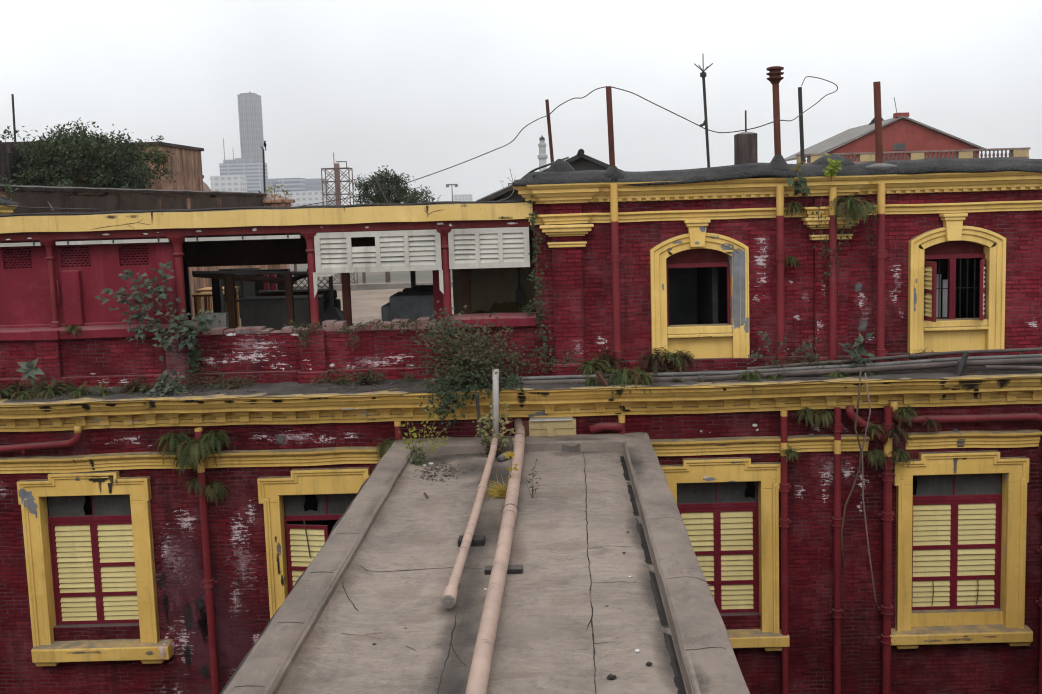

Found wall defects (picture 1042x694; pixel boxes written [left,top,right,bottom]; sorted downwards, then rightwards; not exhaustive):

peeling [695,226,750,333]
peeling [19,489,37,518]
crack [583,454,642,694]